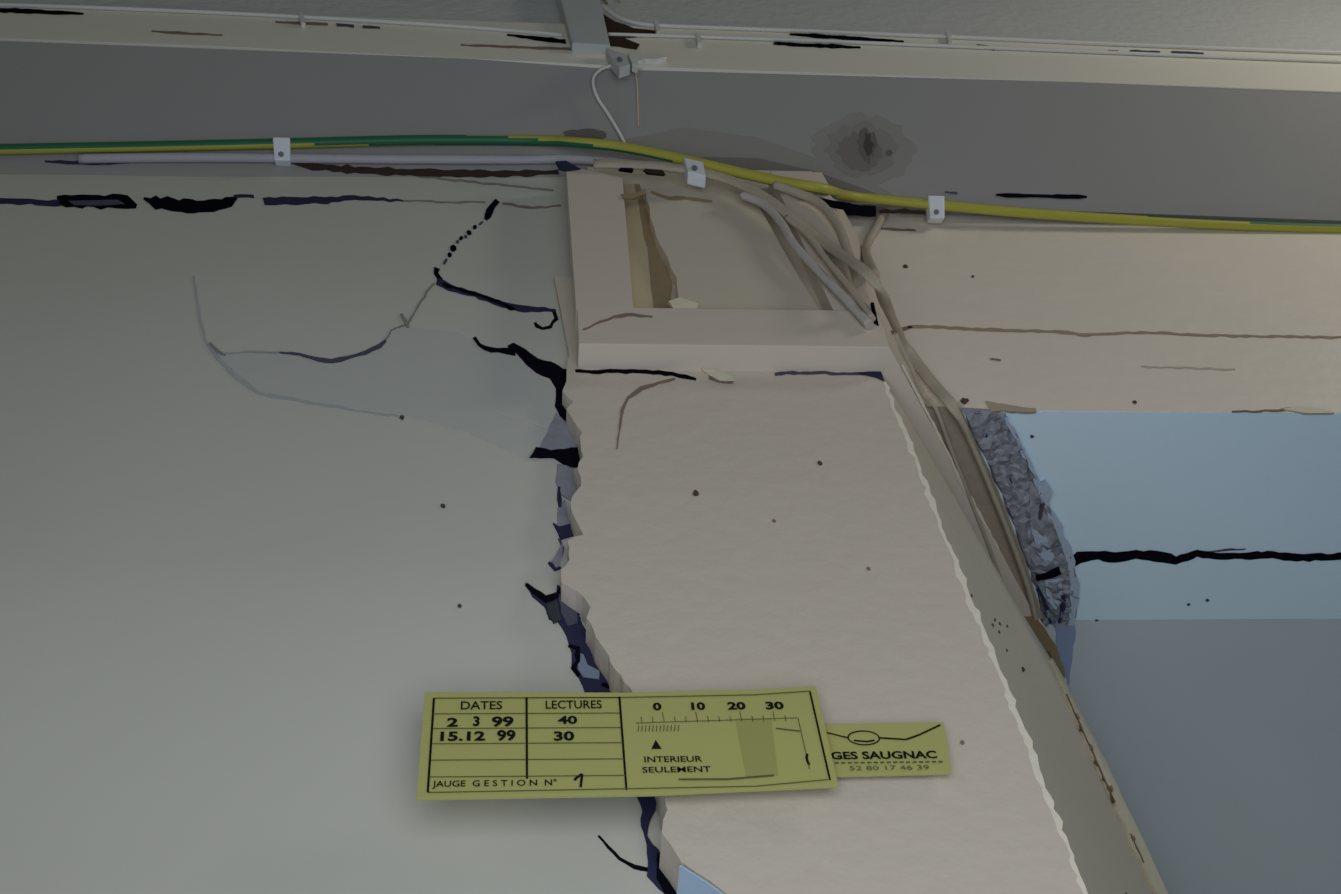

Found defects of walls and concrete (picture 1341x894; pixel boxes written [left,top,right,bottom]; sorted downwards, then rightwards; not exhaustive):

crack [0,160,733,693]
spalling [960,398,1079,628]
crack [1036,548,1341,624]
crack [1066,694,1116,803]
crack [598,796,677,894]